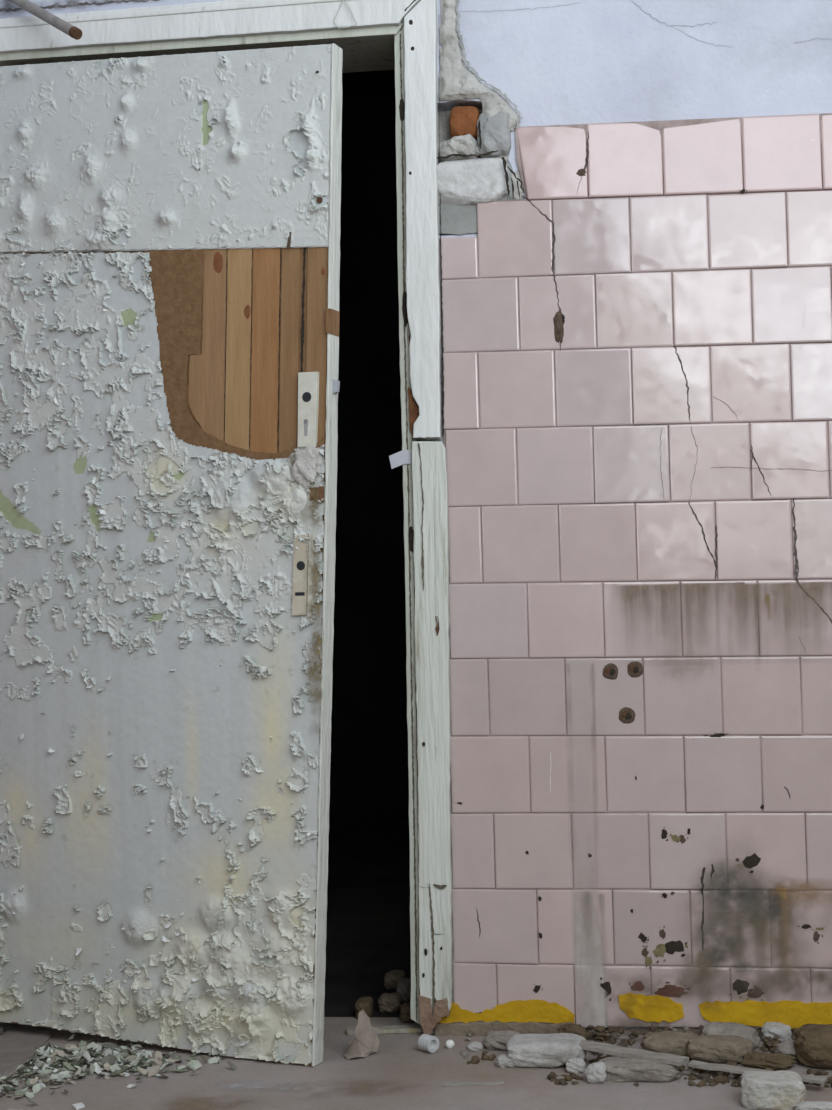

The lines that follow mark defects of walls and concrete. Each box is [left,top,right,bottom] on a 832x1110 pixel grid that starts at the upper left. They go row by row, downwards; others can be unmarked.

flaking render [437,0,525,236]
crack [576,132,589,191]
crack [523,196,565,351]
crack [660,345,832,623]
leakage [624,583,761,614]
leakage [778,582,832,618]
leakage [687,873,790,992]